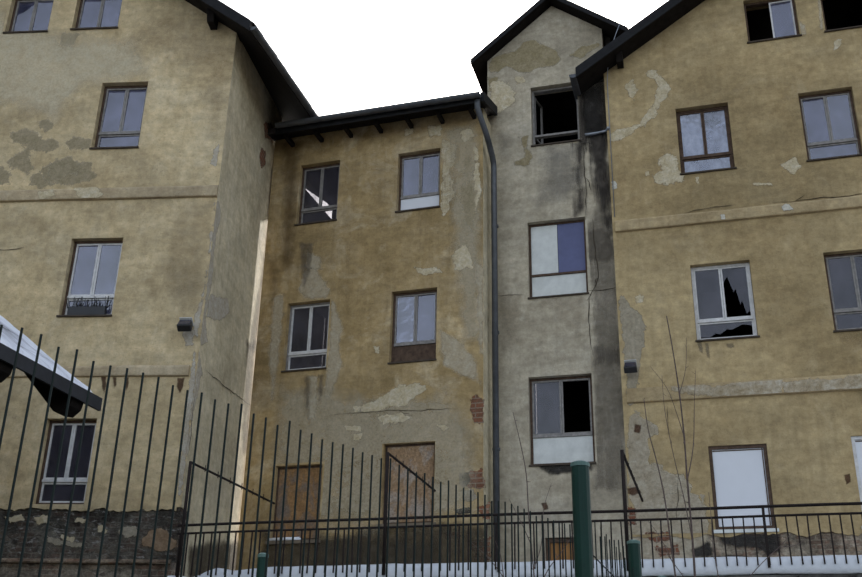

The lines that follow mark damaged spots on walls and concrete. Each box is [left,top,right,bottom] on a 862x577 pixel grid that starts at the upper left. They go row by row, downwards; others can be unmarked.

flaking render [0,25,136,108]
peeling [488,40,600,113]
flaking render [609,70,671,141]
flaking render [0,119,103,199]
flaking render [427,125,481,222]
damp [576,135,610,214]
flaking render [645,153,684,186]
flaking render [781,157,801,175]
flaking render [270,295,283,380]
flaking render [283,245,491,520]
flaking render [618,295,862,559]